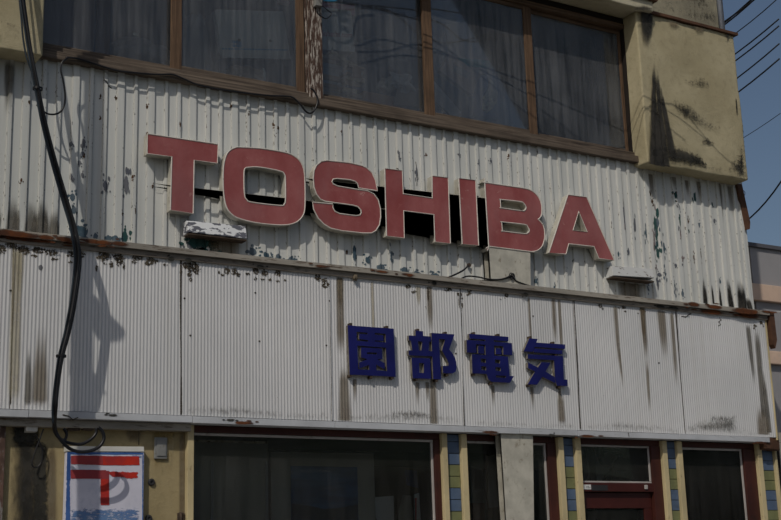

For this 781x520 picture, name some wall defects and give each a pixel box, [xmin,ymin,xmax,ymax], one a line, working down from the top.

leakage [636,6,653,40]
leakage [649,71,720,167]
peeling [67,136,132,242]
peeling [179,238,222,252]
peeling [245,244,299,260]
peeling [623,190,702,298]
leakage [703,284,753,309]
leakage [654,305,678,366]
leakage [25,358,46,403]
leakage [340,376,356,421]
leakage [746,328,771,435]
leakage [12,427,55,520]